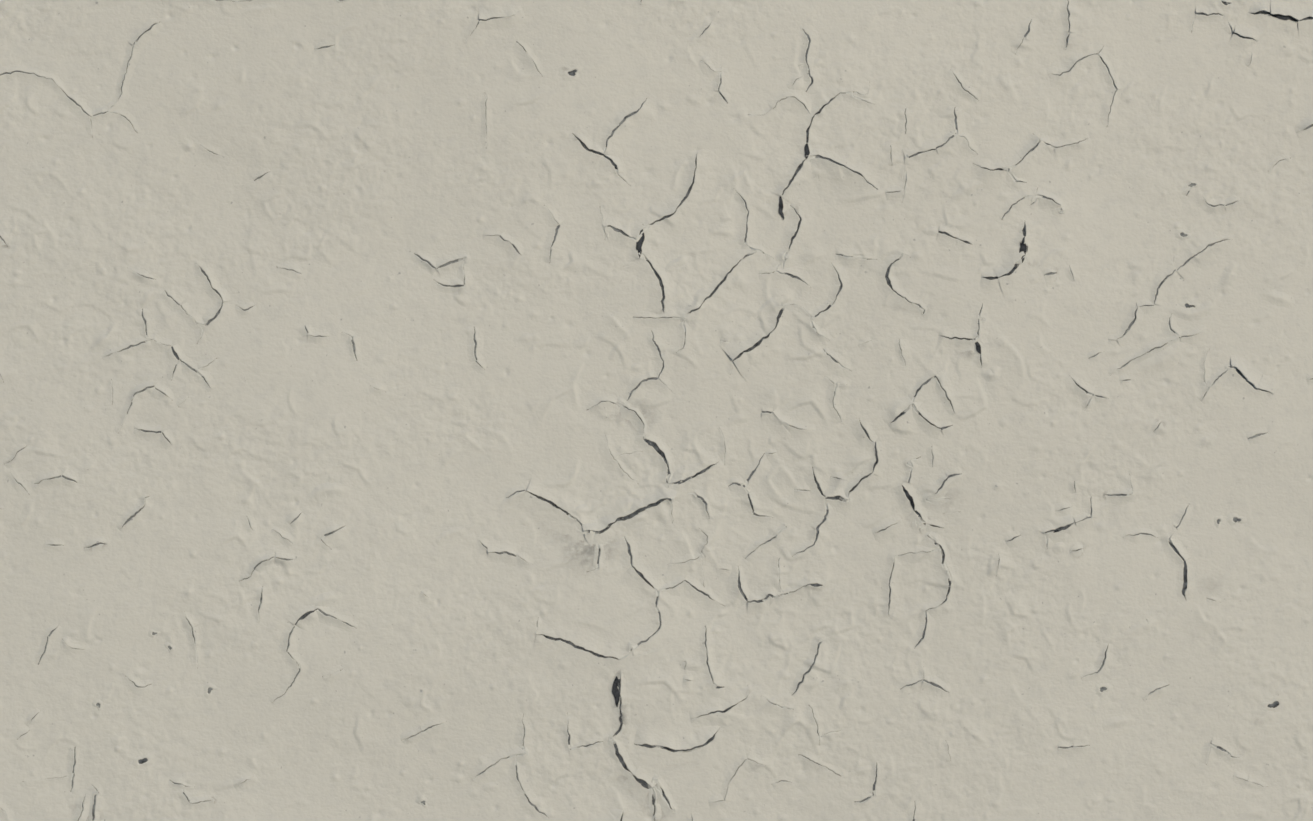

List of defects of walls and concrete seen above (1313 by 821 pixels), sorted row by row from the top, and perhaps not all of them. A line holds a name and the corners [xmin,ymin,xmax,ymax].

peeling [1186,0,1313,52]
peeling [898,106,1092,193]
peeling [719,80,881,385]
peeling [936,220,1080,382]
peeling [1087,181,1279,403]
peeling [505,393,730,579]
peeling [475,538,534,570]
peeling [725,556,825,617]
peeling [630,686,765,778]
peeling [586,808,641,821]